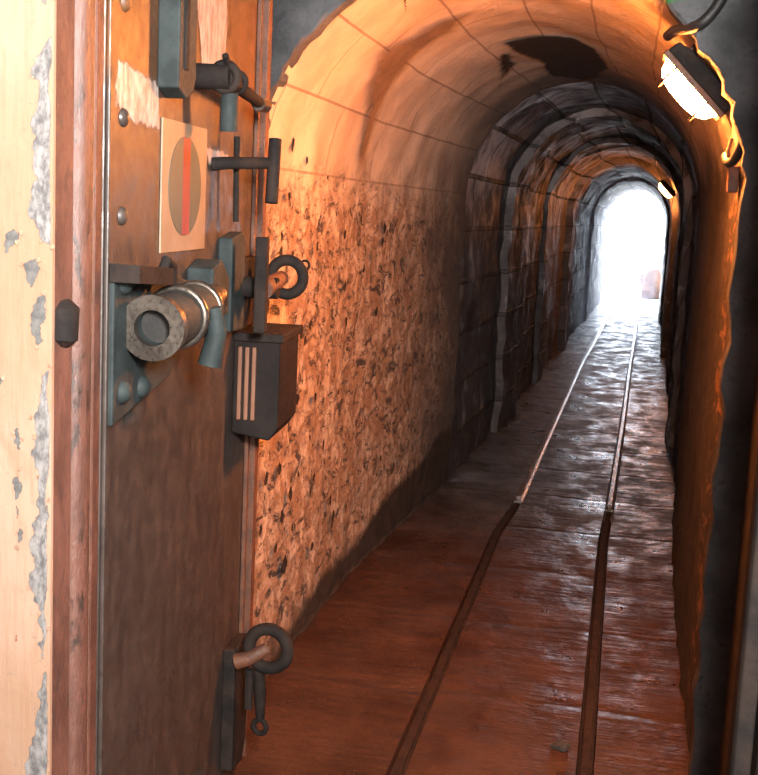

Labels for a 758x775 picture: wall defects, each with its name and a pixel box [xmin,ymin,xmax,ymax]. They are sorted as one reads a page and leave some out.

peeling [28,37,55,250]
peeling [19,258,41,287]
peeling [30,289,47,349]
peeling [11,362,53,659]
peeling [25,671,48,775]